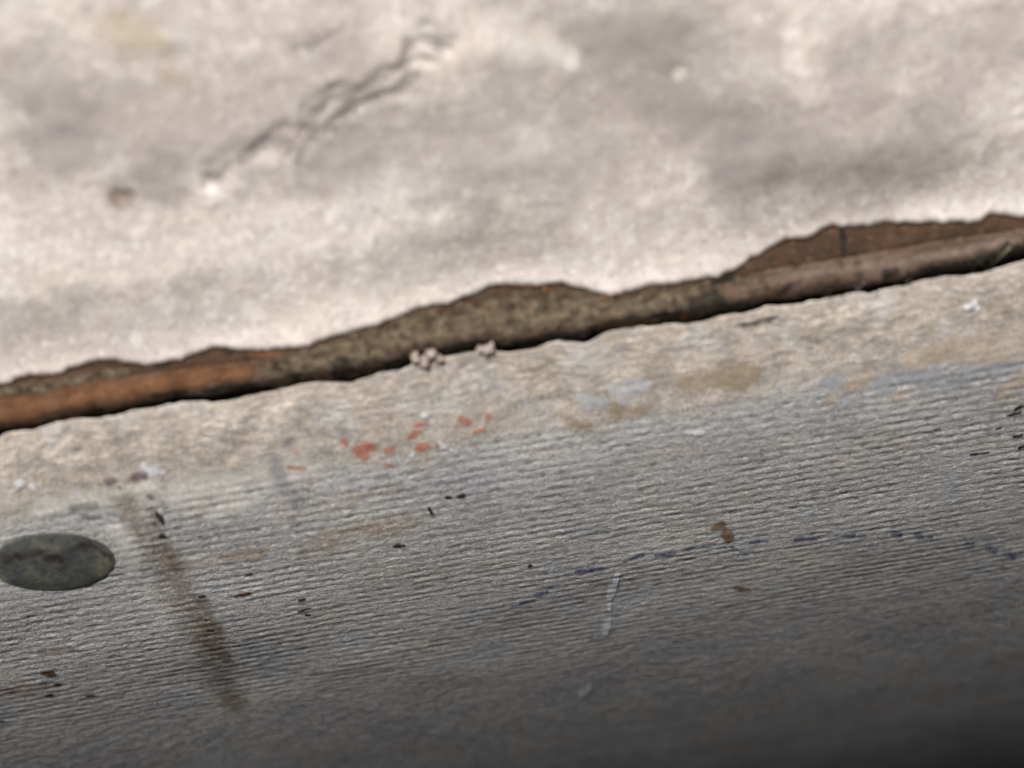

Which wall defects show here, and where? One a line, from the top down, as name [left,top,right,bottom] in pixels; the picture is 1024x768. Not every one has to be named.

spalling [750,221,951,259]
spalling [643,279,700,289]
spalling [356,283,566,331]
peeling [964,300,980,311]
spalling [71,360,144,369]
corrosion [0,350,285,426]